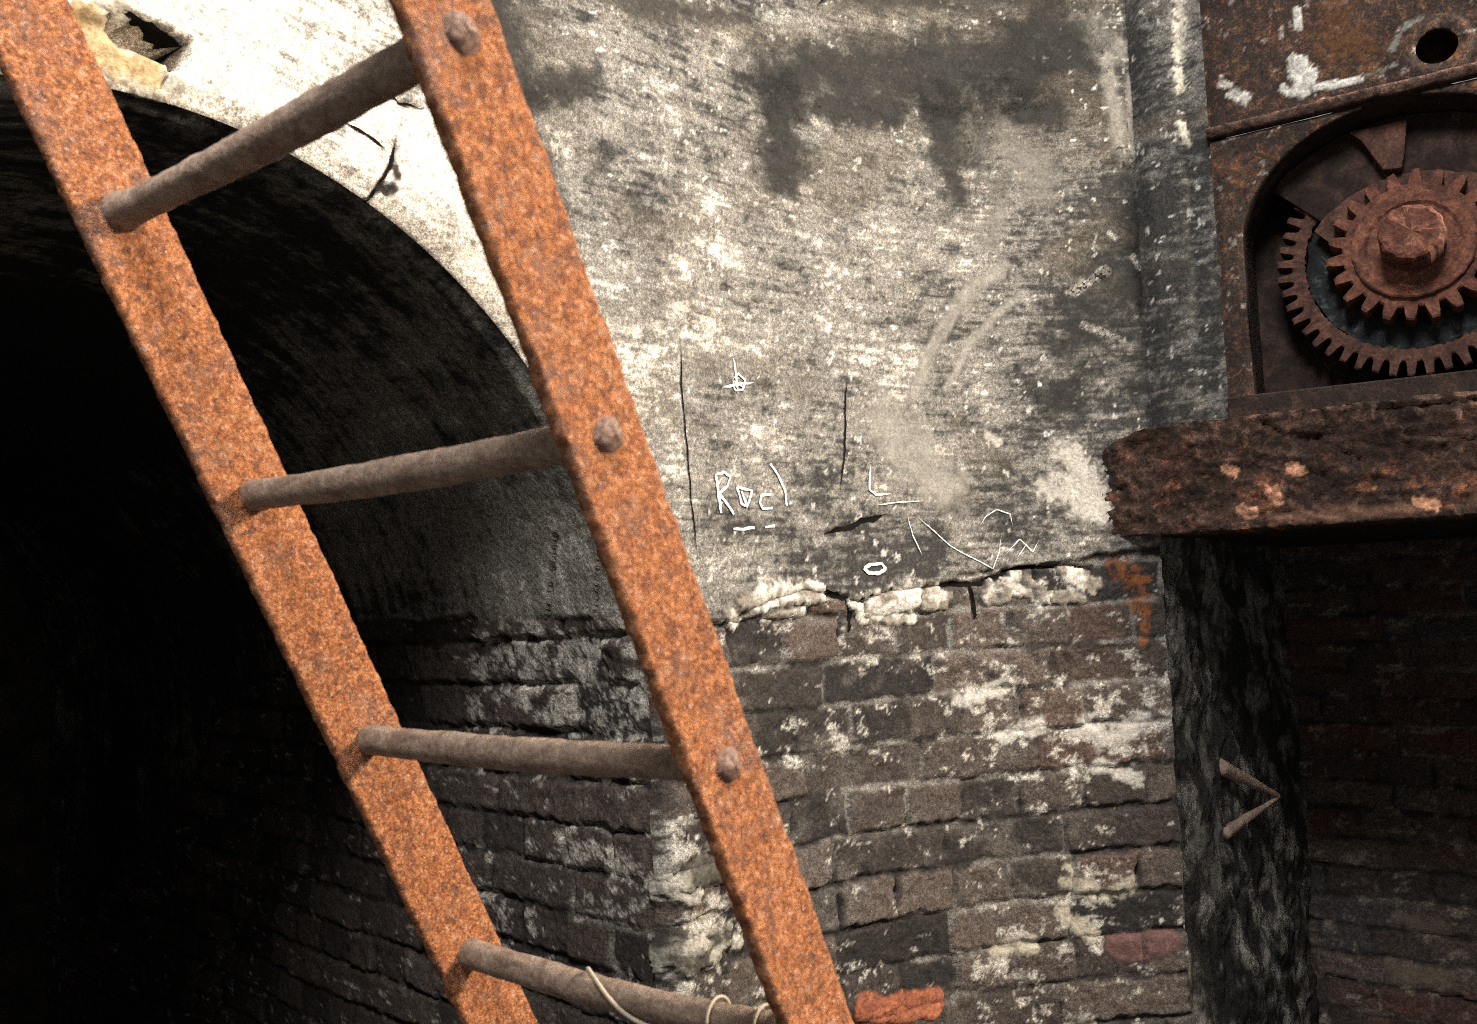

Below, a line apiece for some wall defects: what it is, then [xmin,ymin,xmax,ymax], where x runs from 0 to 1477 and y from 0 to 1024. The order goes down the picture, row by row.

spalling [70,0,183,101]
corrosion [1307,0,1380,80]
leakage [759,72,809,199]
leakage [918,76,1068,243]
crack [823,565,1086,632]
corrosion [1107,557,1150,644]
efflorescence [952,677,1014,707]
efflorescence [995,715,1046,744]
efflorescence [1072,711,1153,788]
efflorescence [1054,864,1137,942]
efflorescence [989,936,1040,958]